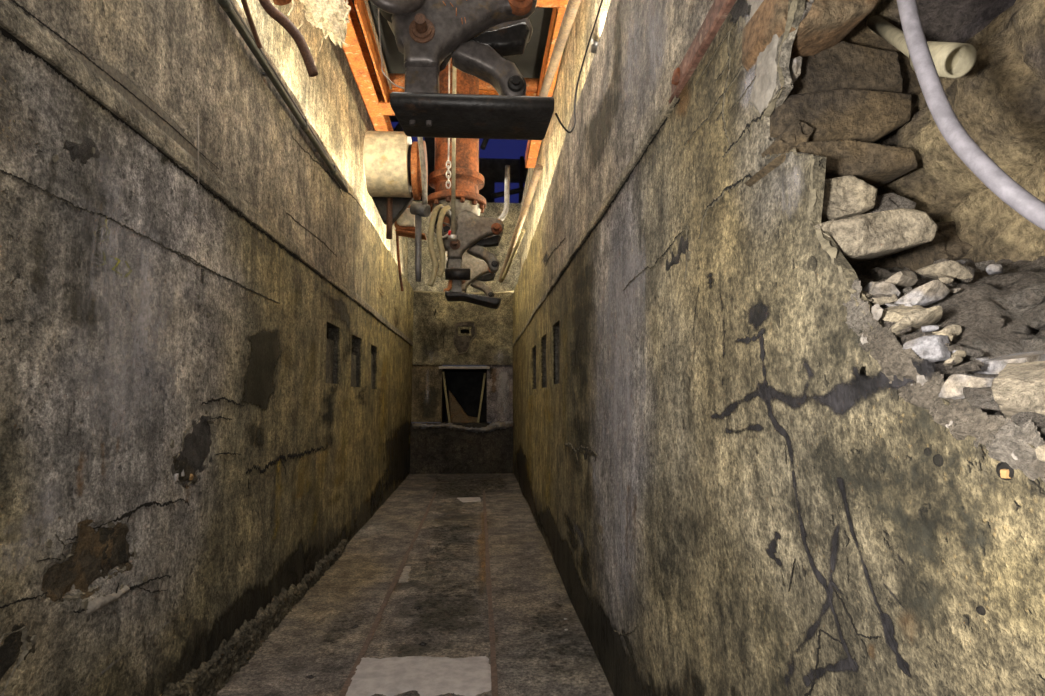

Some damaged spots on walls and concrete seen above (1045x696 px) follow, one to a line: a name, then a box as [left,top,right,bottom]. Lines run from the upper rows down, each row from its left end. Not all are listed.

spalling [730,0,751,25]
crack [0,0,411,346]
crack [545,22,785,292]
spalling [666,236,690,271]
crack [202,397,243,420]
spalling [170,411,219,488]
crack [216,445,328,489]
spalling [41,519,137,611]
crack [788,559,796,592]
spalling [0,624,37,696]
crack [804,585,881,696]